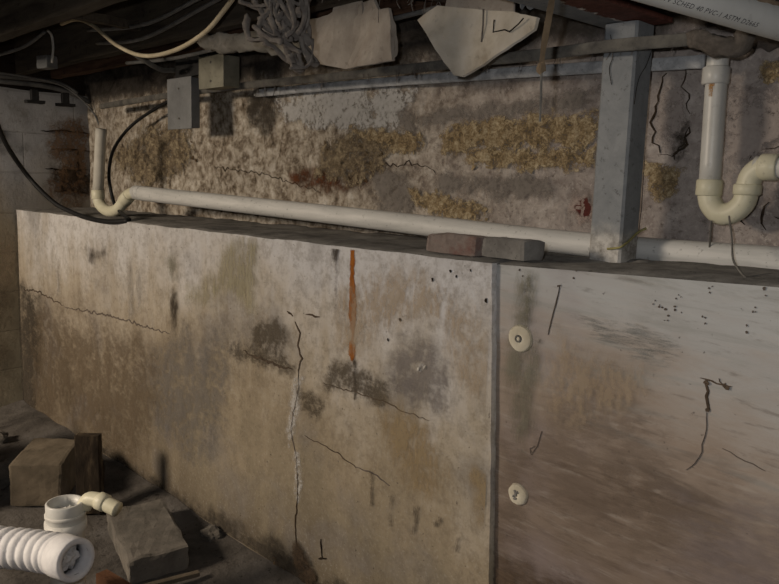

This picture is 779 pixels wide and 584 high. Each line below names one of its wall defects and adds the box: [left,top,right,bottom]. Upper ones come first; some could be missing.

leakage [246,94,277,135]
crack [634,50,691,231]
rust [571,198,593,224]
crack [740,202,779,230]
crack [24,289,169,334]
rust [348,250,356,372]
leakage [230,319,323,437]
crack [243,311,390,584]
leakage [324,363,387,405]
crack [686,378,731,470]